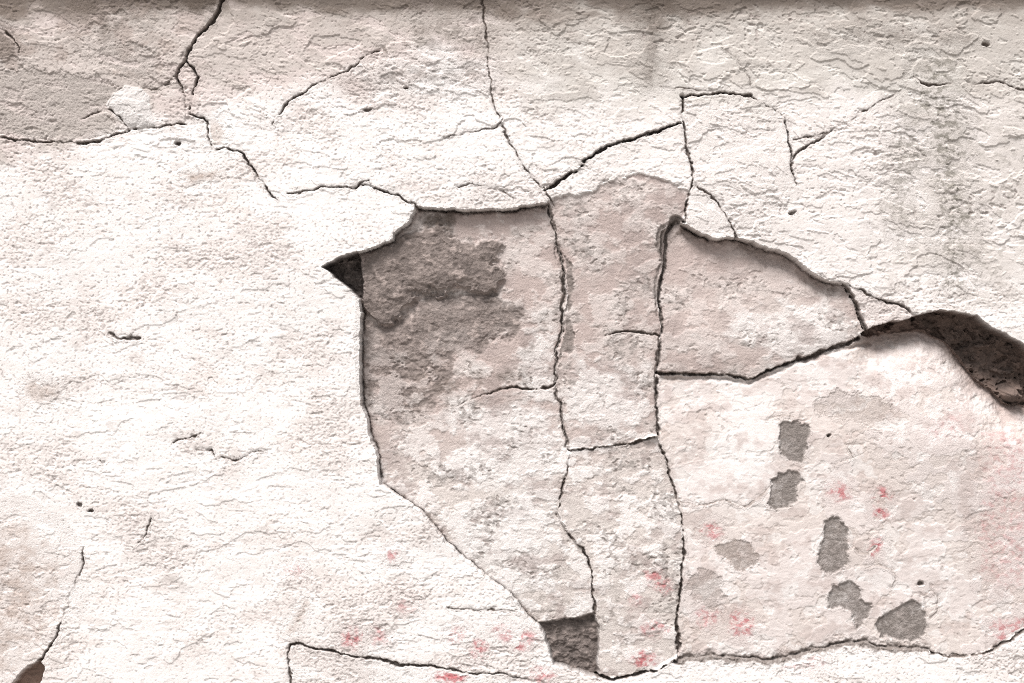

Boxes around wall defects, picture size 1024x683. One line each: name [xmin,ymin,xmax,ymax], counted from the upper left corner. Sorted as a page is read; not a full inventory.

crack [0,0,422,213]
water stain [418,203,465,237]
spalling [333,170,911,611]
crack [440,0,1024,683]
crack [35,546,86,665]
crack [285,639,528,683]
spalling [598,639,630,673]
water stain [690,512,729,550]
water stain [817,473,900,565]
peeling [815,513,940,642]